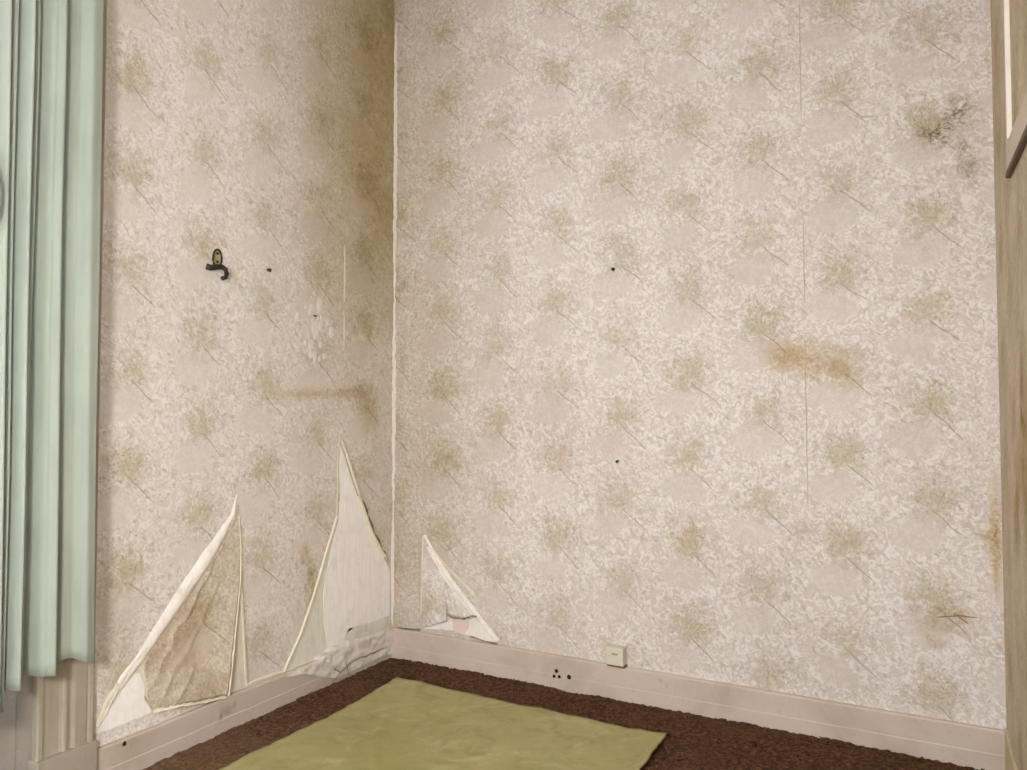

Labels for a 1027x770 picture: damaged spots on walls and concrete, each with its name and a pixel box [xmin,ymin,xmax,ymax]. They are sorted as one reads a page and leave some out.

spalling [286,441,394,678]
flaking render [422,611,471,636]
flaking render [97,653,158,733]